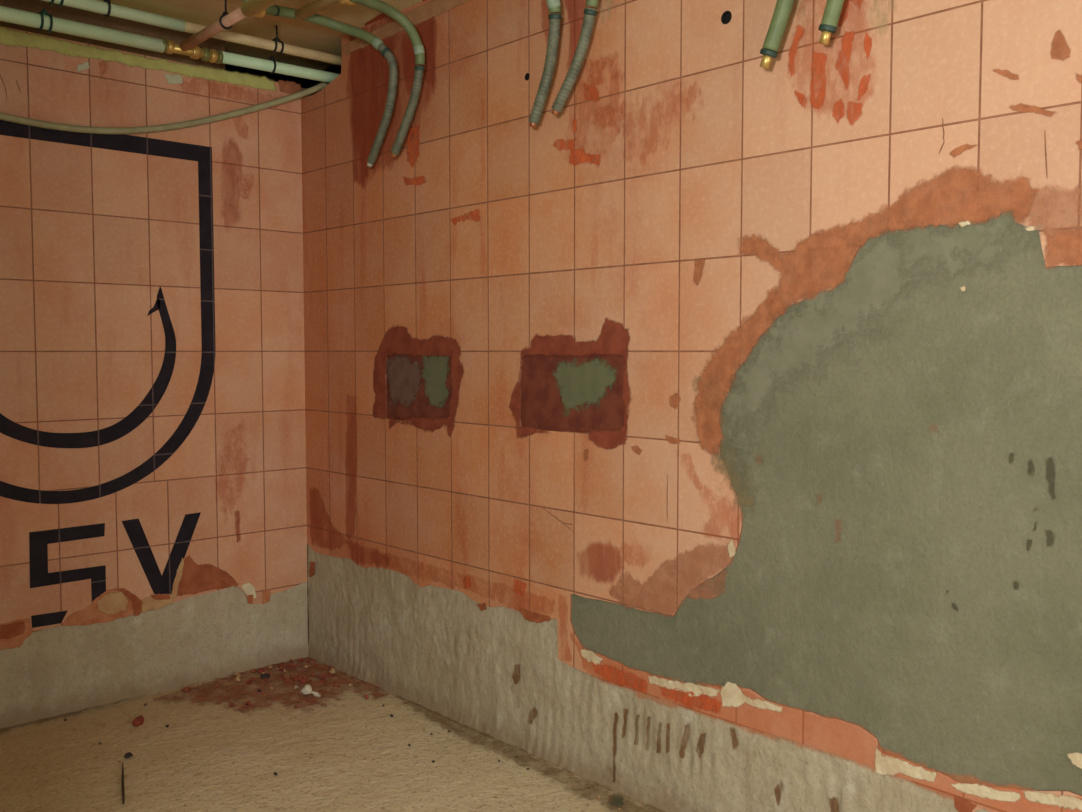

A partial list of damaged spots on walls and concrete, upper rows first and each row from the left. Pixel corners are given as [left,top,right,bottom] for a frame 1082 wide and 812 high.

spalling [0,167,1082,812]